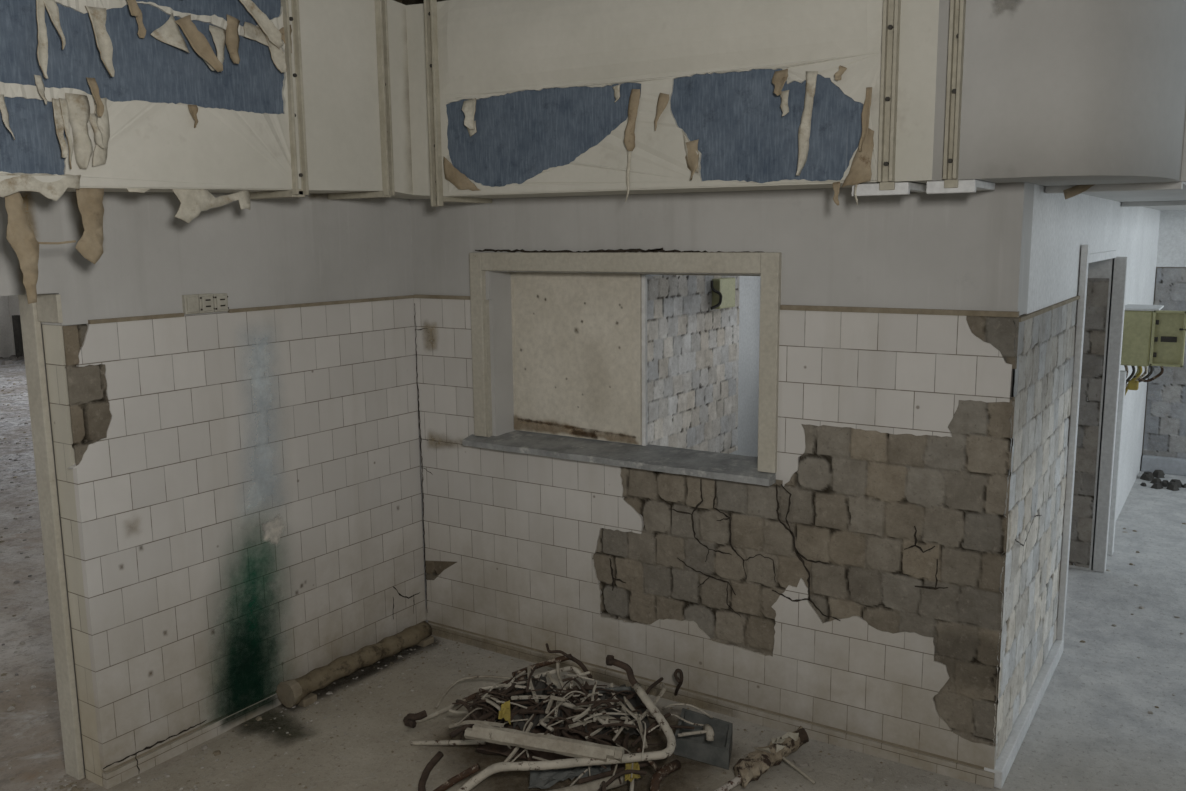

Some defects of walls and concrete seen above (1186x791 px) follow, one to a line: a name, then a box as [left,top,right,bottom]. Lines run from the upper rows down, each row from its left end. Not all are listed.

peeling [0,0,292,201]
peeling [443,83,641,202]
peeling [654,65,874,206]
spalling [63,324,112,466]
crack [672,479,841,621]
spalling [593,275,1109,759]
crack [904,526,948,590]
water stain [227,634,305,740]
water stain [312,642,437,697]